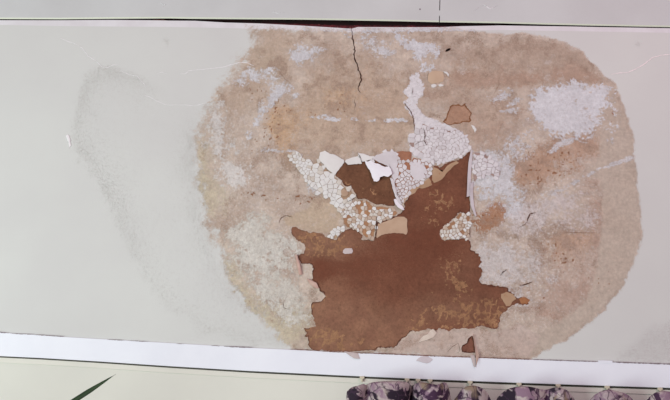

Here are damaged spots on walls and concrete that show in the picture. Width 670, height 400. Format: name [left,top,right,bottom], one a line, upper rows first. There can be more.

crack [351,30,362,103]
leakage [70,23,643,360]
peeling [291,151,530,367]
peeling [443,103,472,125]